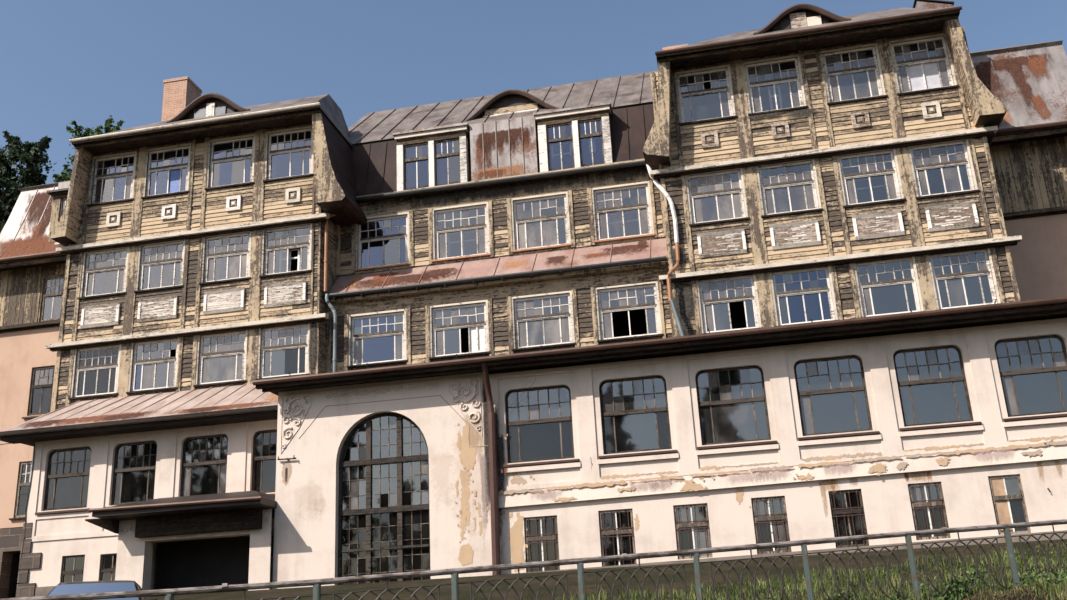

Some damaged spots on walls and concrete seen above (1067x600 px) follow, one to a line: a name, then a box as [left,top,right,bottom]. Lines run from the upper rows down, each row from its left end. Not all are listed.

rust [974,53,1051,119]
rust [476,127,534,179]
rust [0,192,65,258]
rust [584,240,649,258]
peeling [932,207,970,226]
peeling [86,307,114,324]
peeling [141,302,172,317]
peeling [270,285,302,302]
rust [346,268,457,289]
flaking render [455,423,489,566]
flaking render [498,435,1067,502]
flaking render [501,511,528,572]